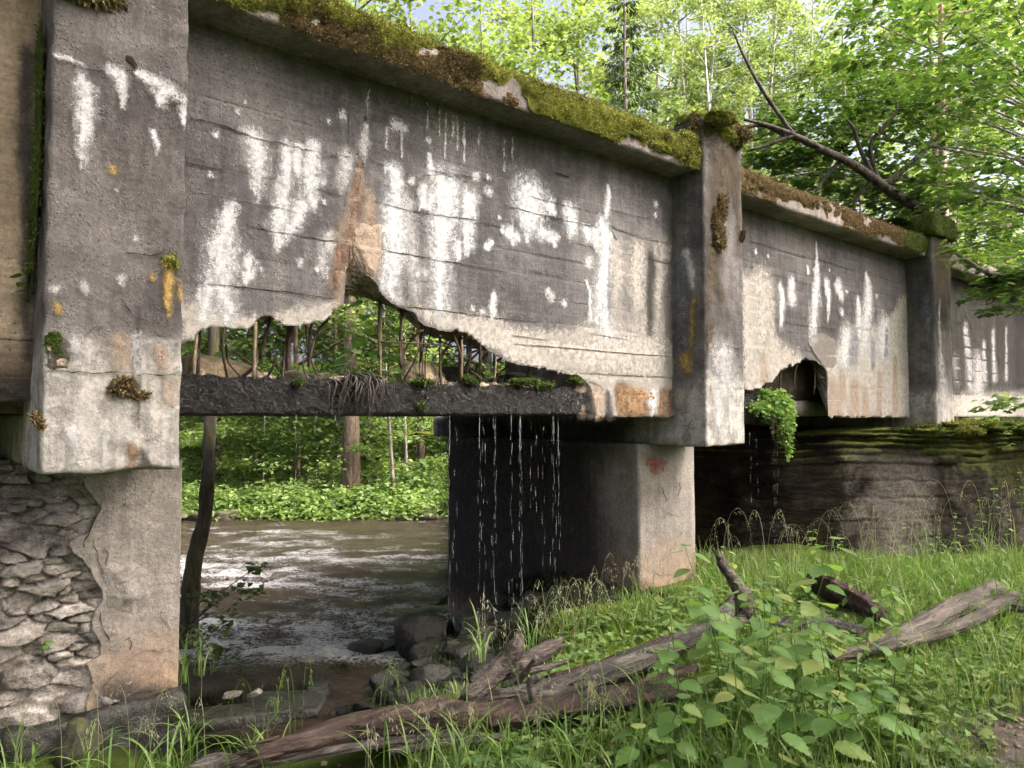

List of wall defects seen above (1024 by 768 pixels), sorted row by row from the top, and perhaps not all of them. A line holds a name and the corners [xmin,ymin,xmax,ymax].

efflorescence [55,54,95,168]
efflorescence [105,65,187,126]
efflorescence [338,124,368,194]
corrosion [333,158,376,301]
spalling [344,223,500,357]
water stain [379,103,695,608]
corrosion [578,384,674,416]
water stain [707,249,802,430]
spalling [779,357,827,387]
water stain [806,241,910,418]
water stain [922,236,1024,421]
crack [84,480,144,572]